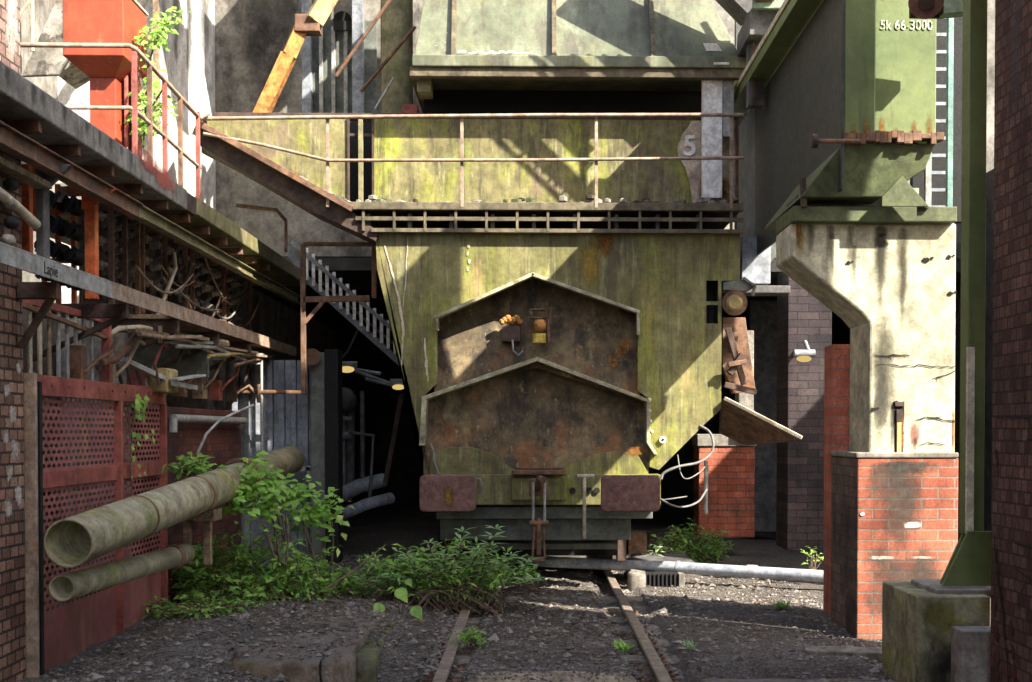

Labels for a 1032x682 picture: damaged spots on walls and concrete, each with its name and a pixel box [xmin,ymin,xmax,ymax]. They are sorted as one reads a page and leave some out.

damp [876,227,886,274]
damp [875,327,889,415]
crack [875,354,956,382]
crack [917,416,956,445]
rust [628,447,646,455]